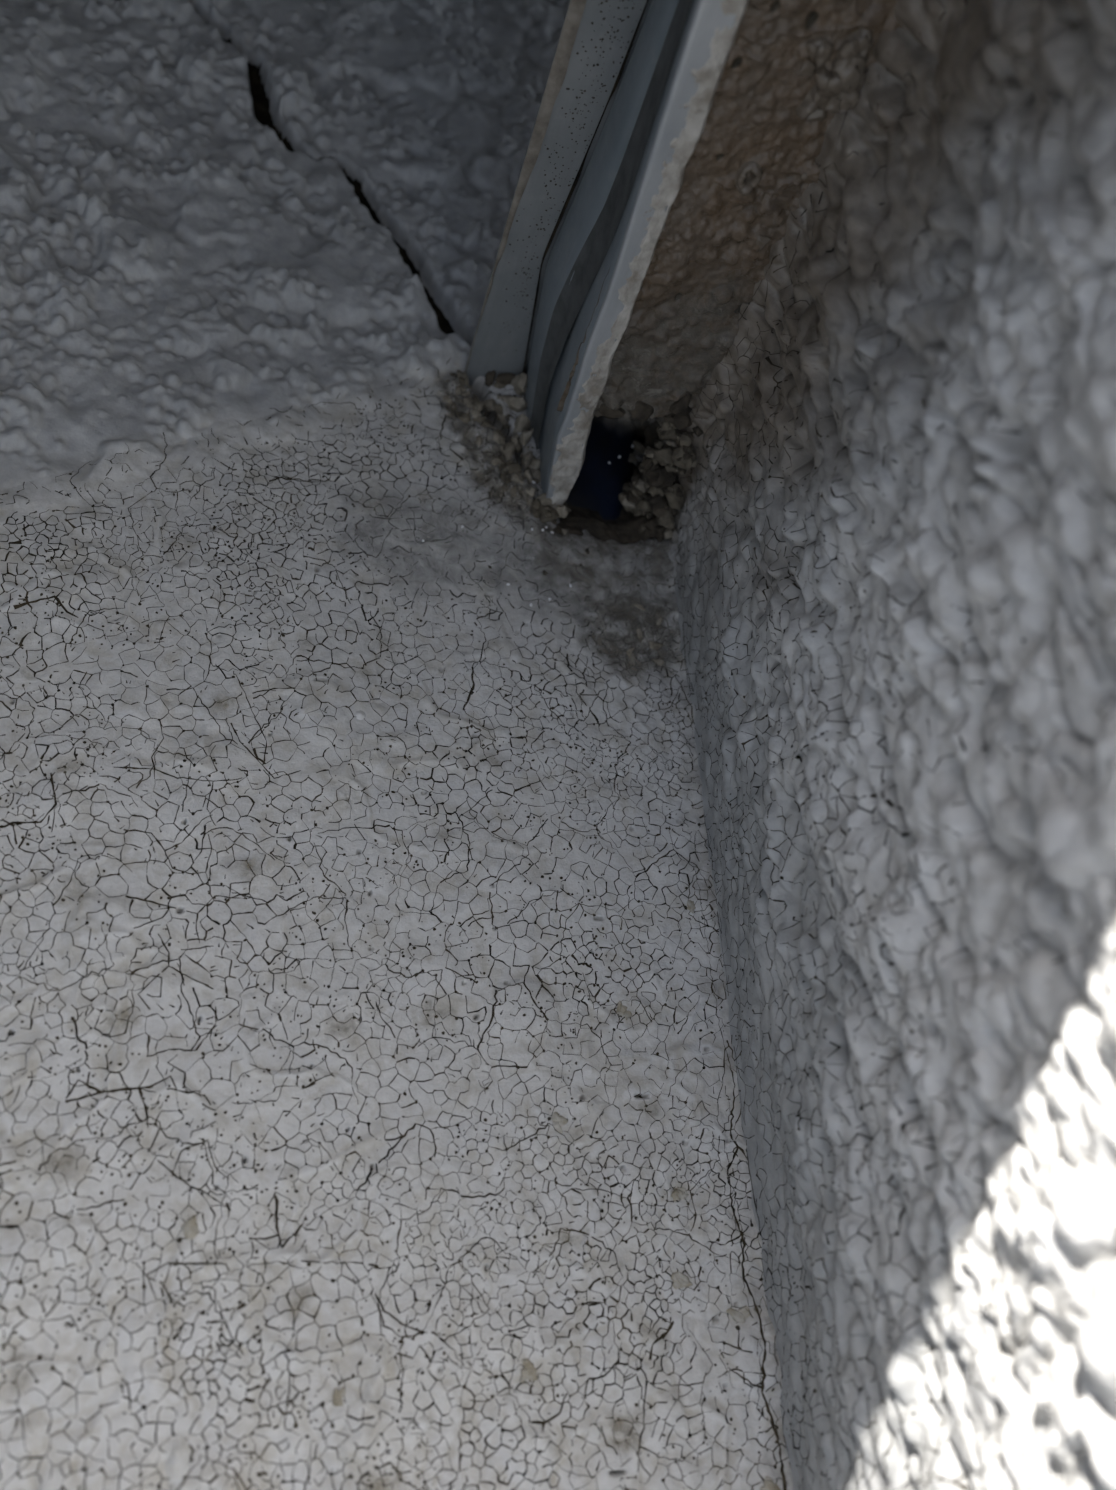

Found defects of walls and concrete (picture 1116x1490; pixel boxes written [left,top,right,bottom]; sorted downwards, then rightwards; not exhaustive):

crack [221,37,455,335]
spalling [443,370,572,523]
spalling [629,393,703,467]
water stain [582,597,676,676]
crack [872,732,955,788]
crack [929,716,967,751]
crack [893,1332,962,1379]